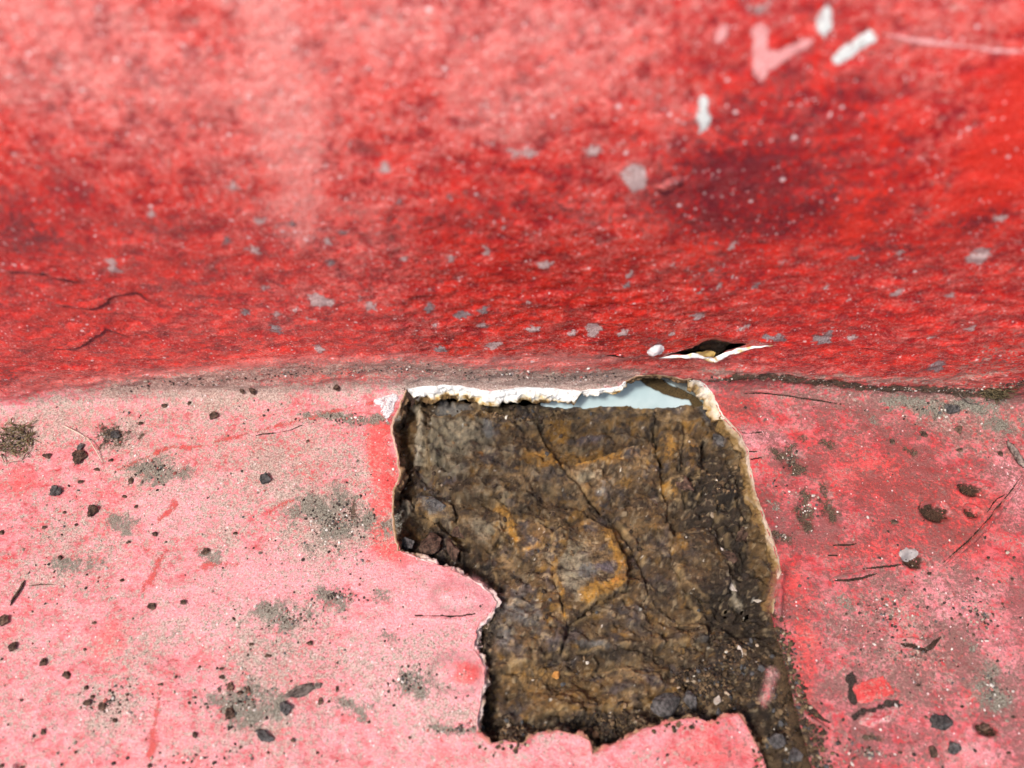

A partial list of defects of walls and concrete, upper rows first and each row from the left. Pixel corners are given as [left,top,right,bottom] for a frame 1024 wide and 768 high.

spalling [374,374,782,766]